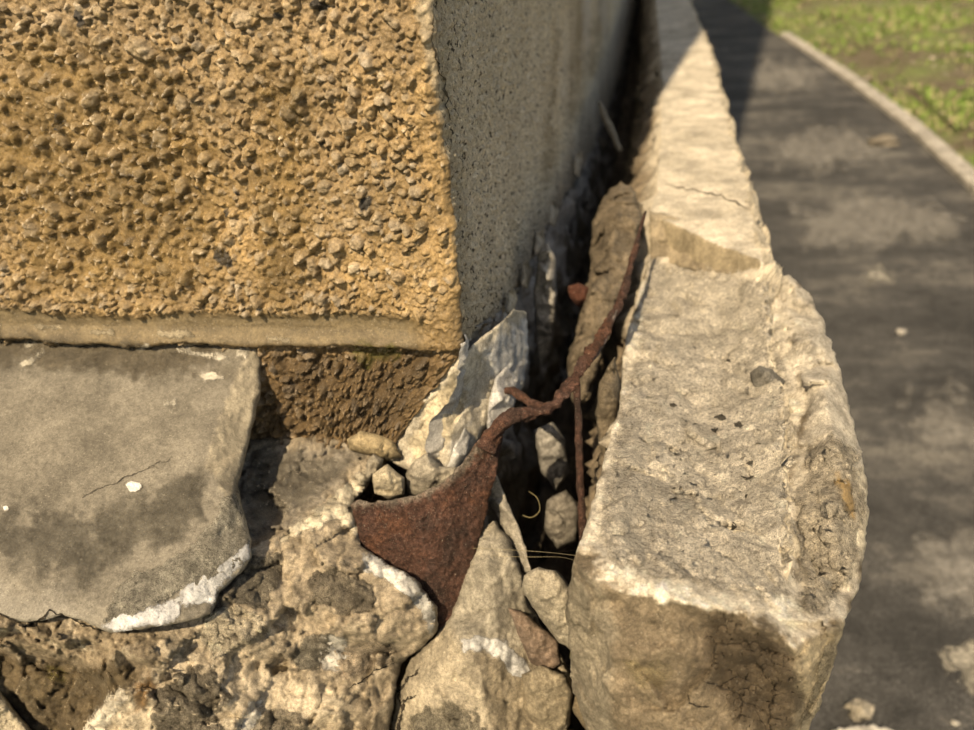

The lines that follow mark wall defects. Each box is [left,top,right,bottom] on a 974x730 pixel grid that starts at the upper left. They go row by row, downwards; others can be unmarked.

crack [431,15,452,121]
crack [666,183,751,211]
peeling [390,198,559,470]
damp [0,476,202,585]
spalling [280,470,370,542]
spalling [334,639,395,679]
crack [349,644,420,730]
spalling [409,703,486,730]
crack [687,680,729,708]